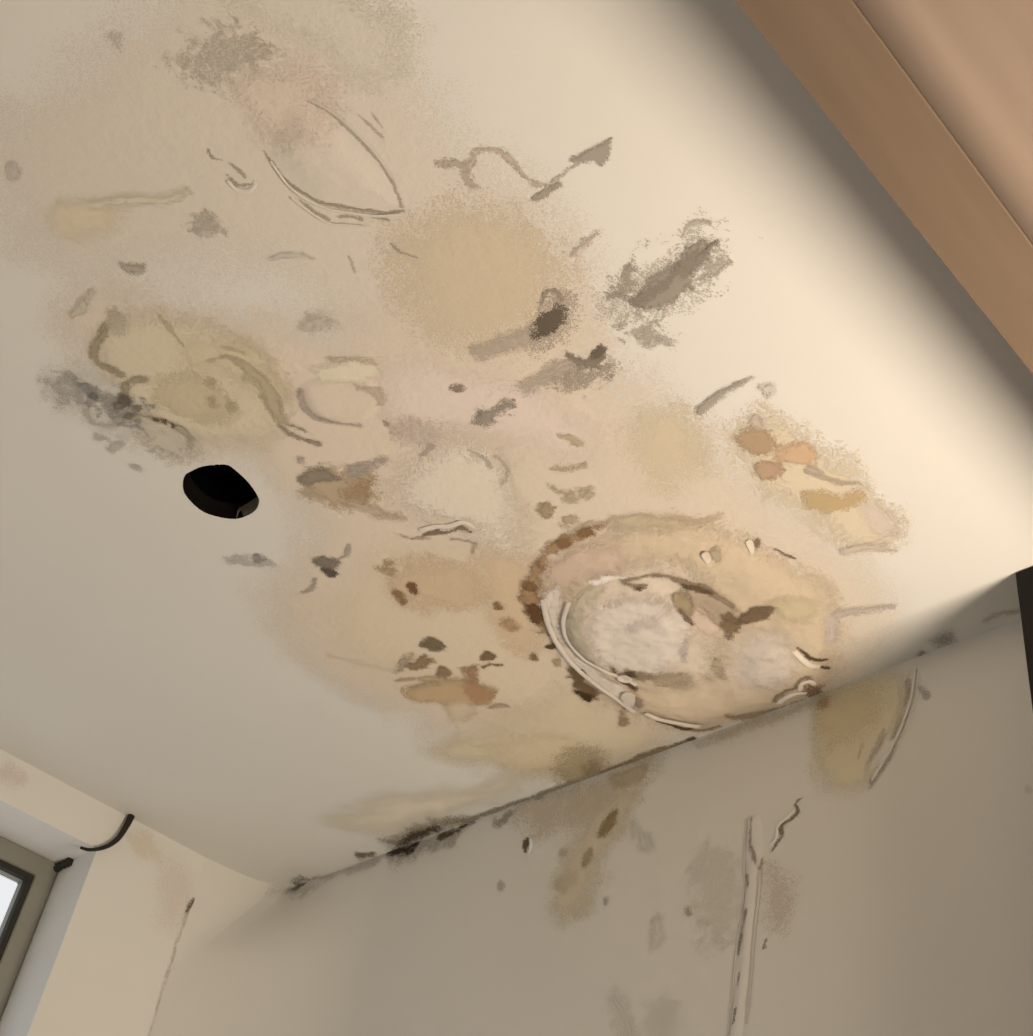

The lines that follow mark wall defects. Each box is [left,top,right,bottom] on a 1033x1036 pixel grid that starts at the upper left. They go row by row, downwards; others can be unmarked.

peeling [589,573,627,586]
spalling [719,612,742,641]
corrosion [400,663,500,708]
peeling [538,584,701,729]
peeling [776,650,821,704]
crack [732,798,800,1024]